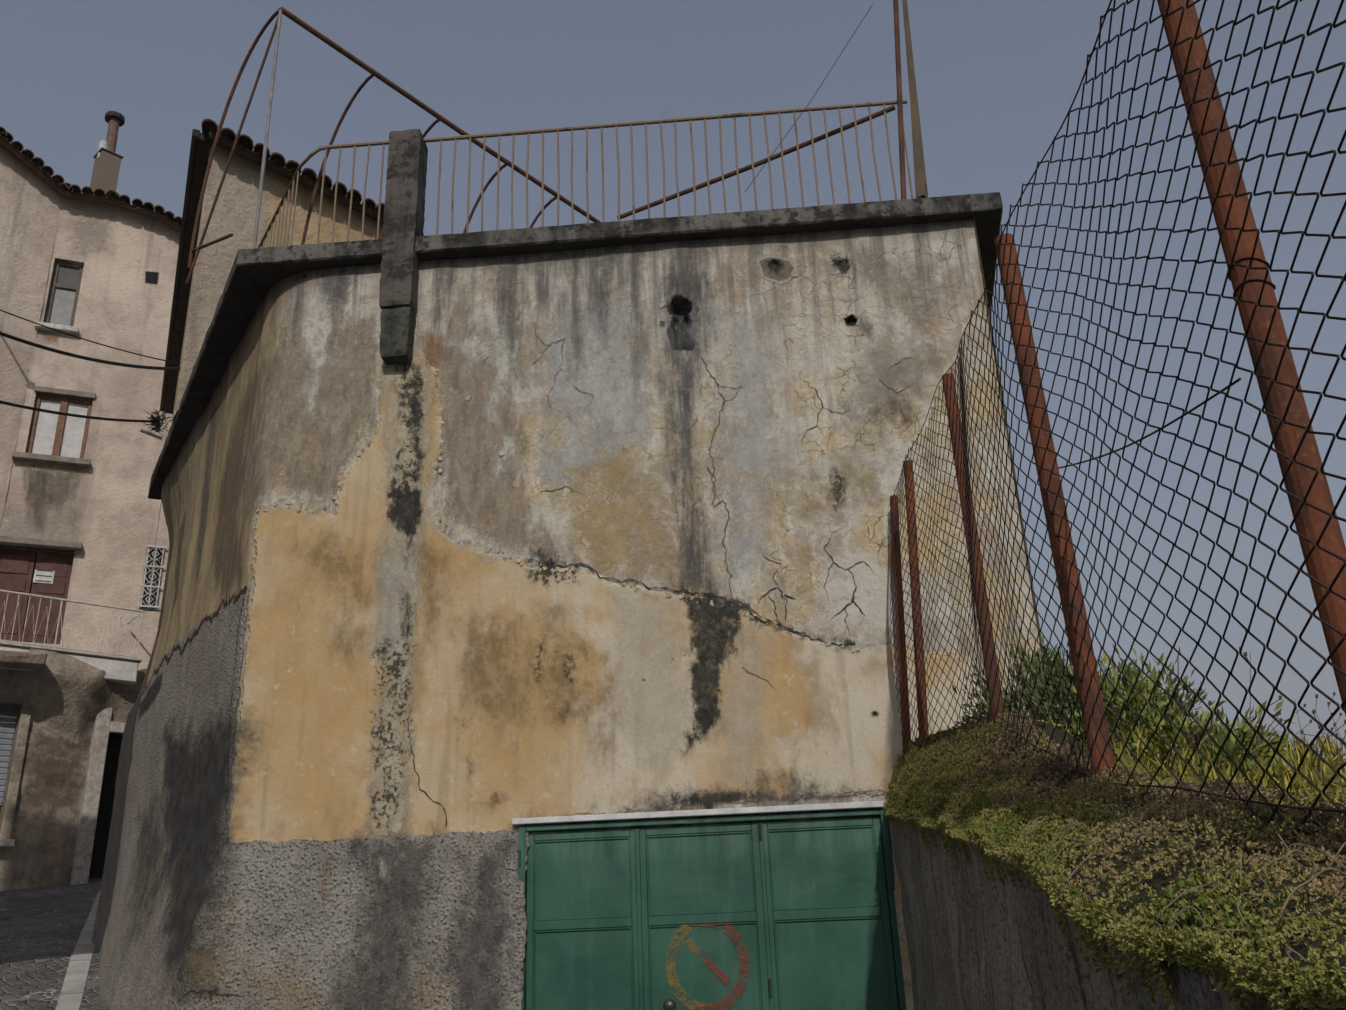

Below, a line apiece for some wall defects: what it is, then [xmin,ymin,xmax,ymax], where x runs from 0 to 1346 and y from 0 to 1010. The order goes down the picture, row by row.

peeling [422,290,576,573]
crack [533,323,593,414]
spalling [659,299,699,350]
crack [528,357,897,650]
spalling [756,255,798,285]
crack [879,357,916,393]
damp [333,334,443,1010]
damp [683,539,750,748]
damp [132,717,252,1000]